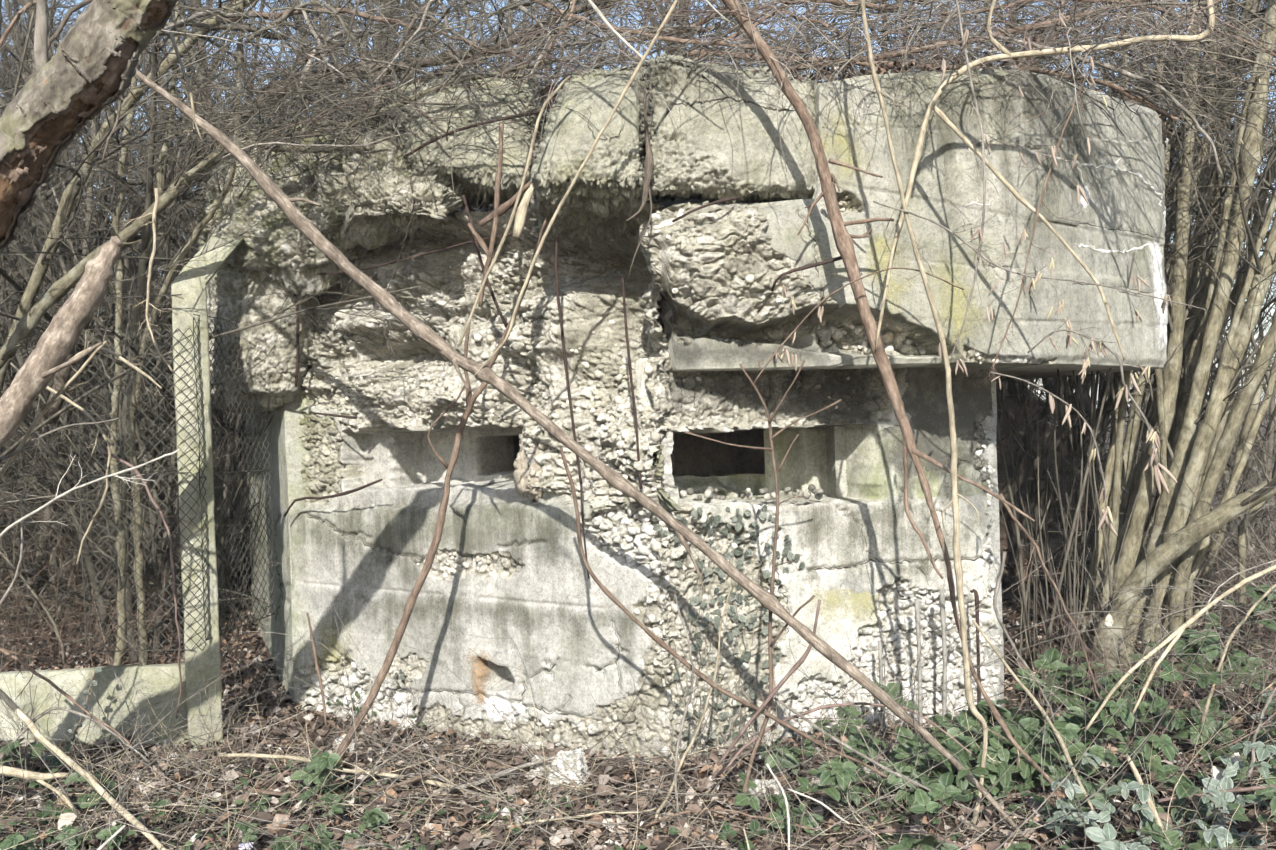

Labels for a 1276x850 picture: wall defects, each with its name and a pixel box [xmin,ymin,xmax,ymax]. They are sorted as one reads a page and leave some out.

crack [662,67,795,121]
spalling [827,191,864,217]
spalling [295,201,1055,763]
crack [274,516,423,619]
rust [472,655,489,702]